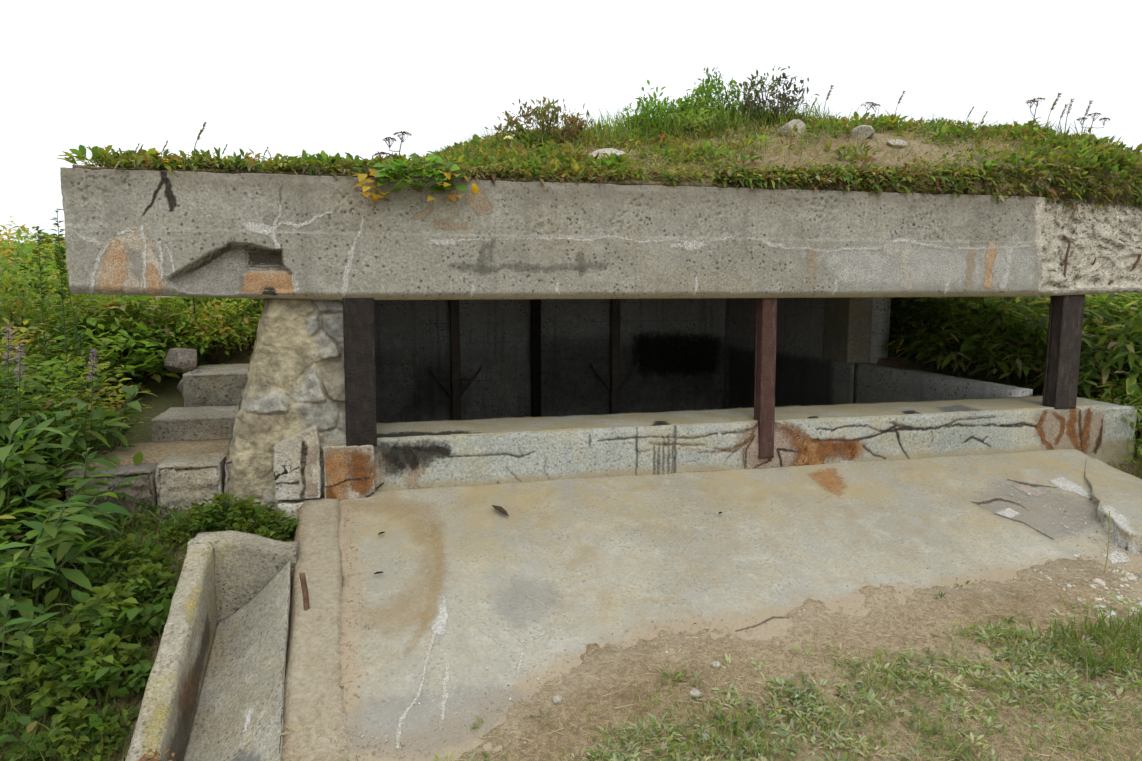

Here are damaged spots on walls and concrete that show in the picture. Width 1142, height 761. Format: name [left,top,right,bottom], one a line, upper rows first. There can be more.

corrosion [89,225,175,294]
spalling [167,241,299,296]
crack [240,189,332,251]
crack [340,210,364,297]
spalling [1033,198,1142,294]
corrosion [306,442,384,501]
crack [448,453,530,478]
crack [599,428,753,465]
corrosion [714,423,863,495]
corrosion [1000,408,1104,454]
peeling [973,477,1136,564]
damp [396,597,448,748]